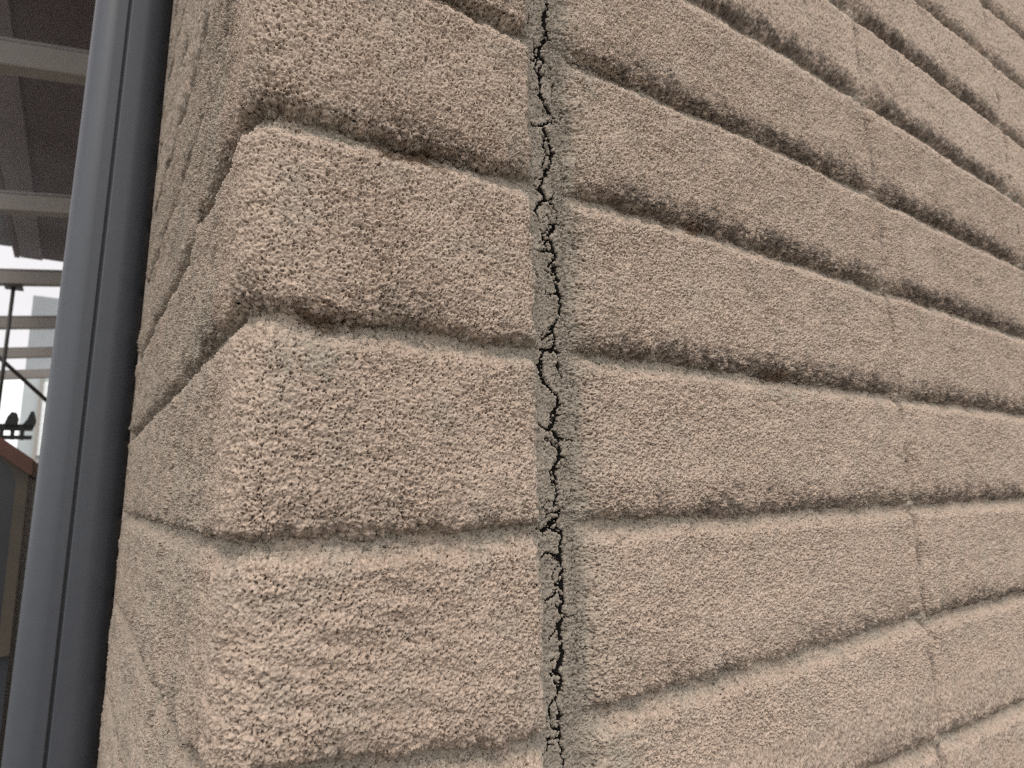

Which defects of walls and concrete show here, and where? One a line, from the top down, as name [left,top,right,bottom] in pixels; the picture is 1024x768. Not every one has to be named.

crack [527,3,572,766]